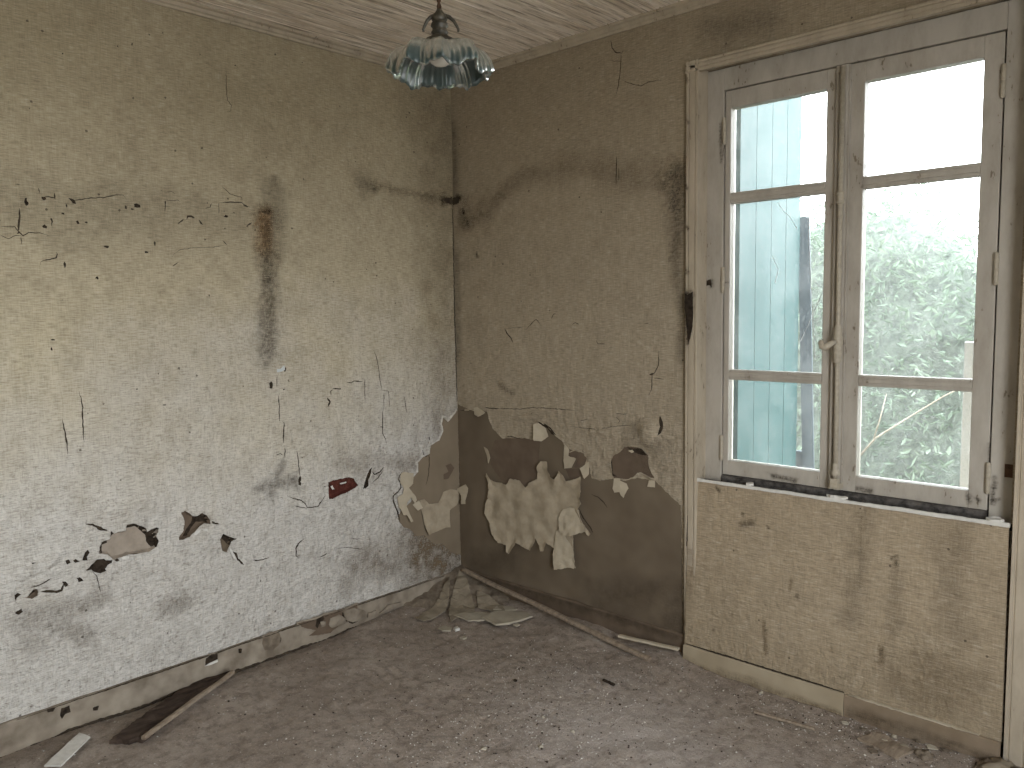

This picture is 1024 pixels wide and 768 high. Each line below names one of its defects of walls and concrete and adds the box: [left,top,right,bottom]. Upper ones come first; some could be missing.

crack [1,184,125,267]
damp [441,196,468,224]
crack [62,392,84,452]
crack [348,352,407,440]
spalling [15,519,162,615]
spalling [175,508,267,565]
flaking render [324,465,384,502]
peeling [393,404,684,633]